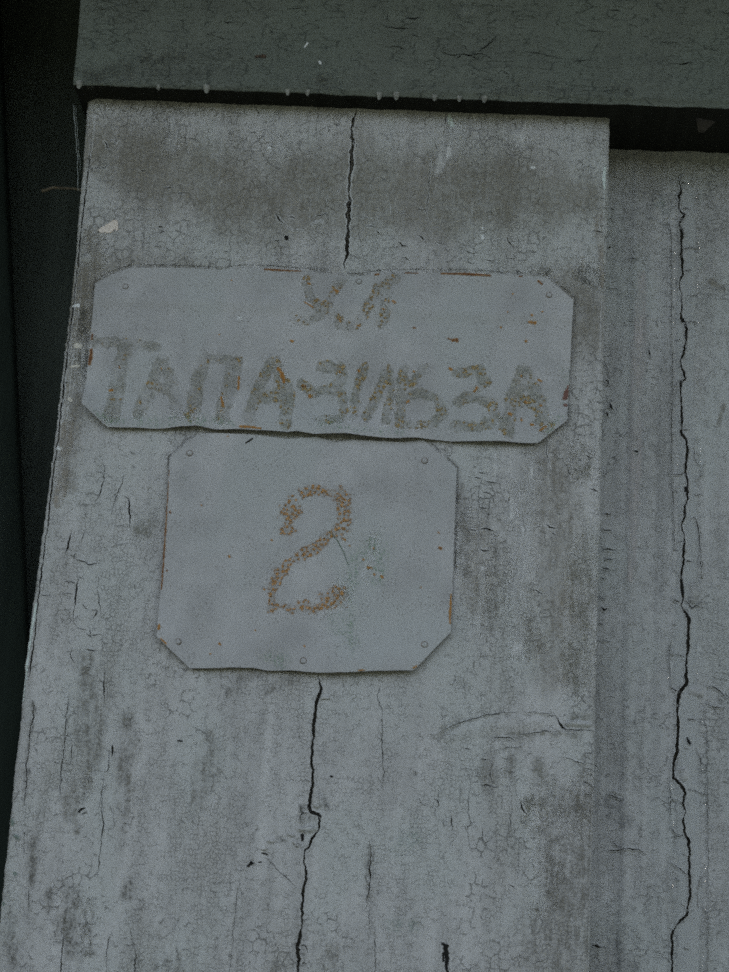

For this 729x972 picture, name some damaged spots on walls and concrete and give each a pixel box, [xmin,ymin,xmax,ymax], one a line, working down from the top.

crack [274,108,539,275]
crack [604,362,615,418]
crack [646,174,729,972]
crack [228,868,244,972]
crack [267,674,326,972]
crack [418,710,623,890]
crack [608,839,646,856]